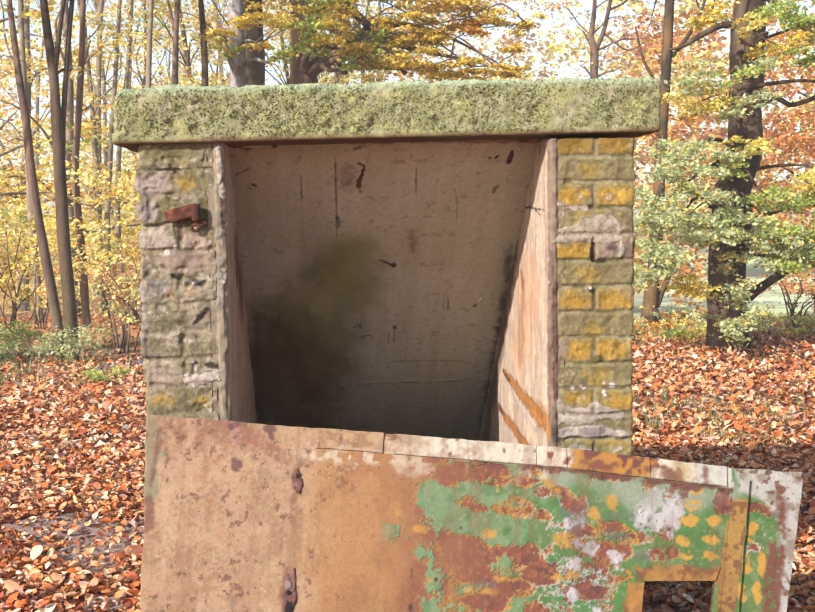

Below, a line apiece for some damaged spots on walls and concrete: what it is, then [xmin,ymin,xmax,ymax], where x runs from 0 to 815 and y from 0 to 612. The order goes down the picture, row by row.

damp [250,303,418,429]
rust [498,403,529,445]
rust [502,368,551,435]